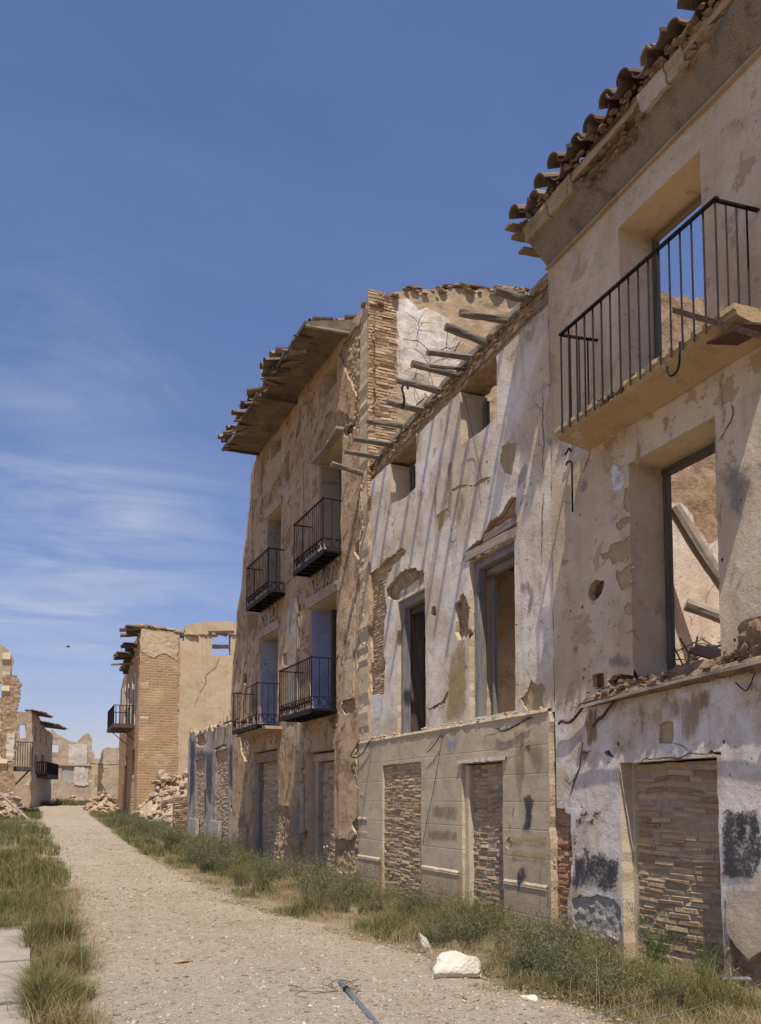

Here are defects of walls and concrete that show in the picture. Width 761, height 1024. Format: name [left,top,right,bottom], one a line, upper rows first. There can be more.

crack [403,311,460,404]
peeling [500,441,517,476]
flaking render [462,495,519,563]
peeling [602,487,636,591]
flaking render [332,481,424,728]
flaking render [459,593,475,642]
peeling [519,681,545,711]